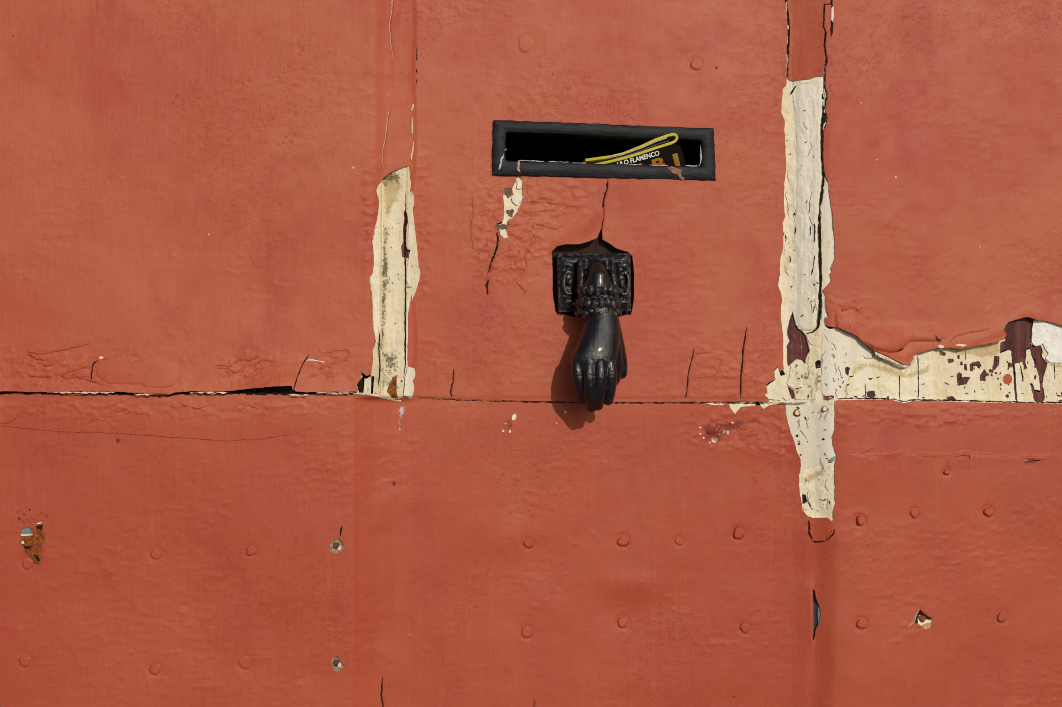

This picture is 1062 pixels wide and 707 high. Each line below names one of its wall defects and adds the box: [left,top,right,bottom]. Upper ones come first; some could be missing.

crack [784,0,792,77]
crack [823,0,834,109]
peeling [496,176,523,238]
peeling [547,206,604,257]
peeling [357,166,420,399]
peeling [699,62,1062,521]
crack [0,369,578,403]